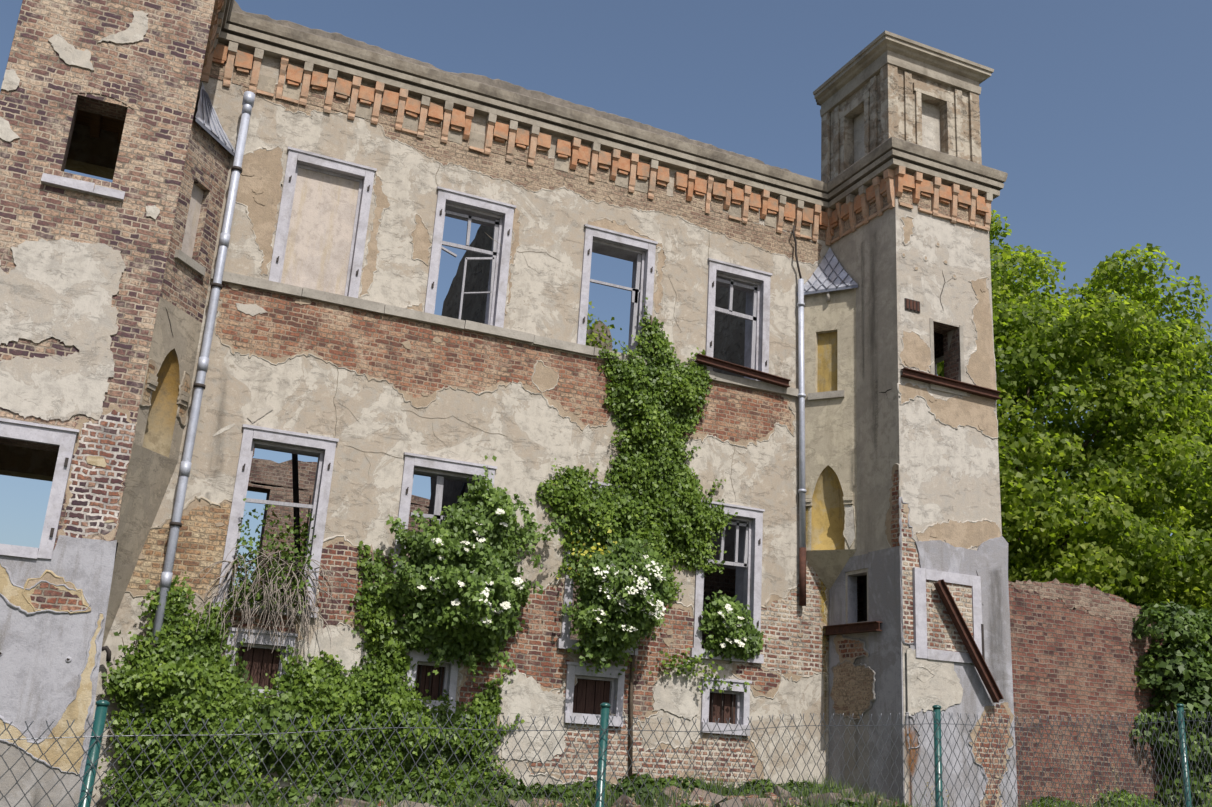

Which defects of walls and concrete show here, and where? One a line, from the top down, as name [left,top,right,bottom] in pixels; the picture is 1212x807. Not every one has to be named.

peeling [0,237,159,541]
spalling [214,145,617,431]
spalling [681,372,796,448]
spalling [0,561,104,775]
spalling [456,577,765,789]
spalling [730,560,876,720]
peeling [884,463,1002,750]